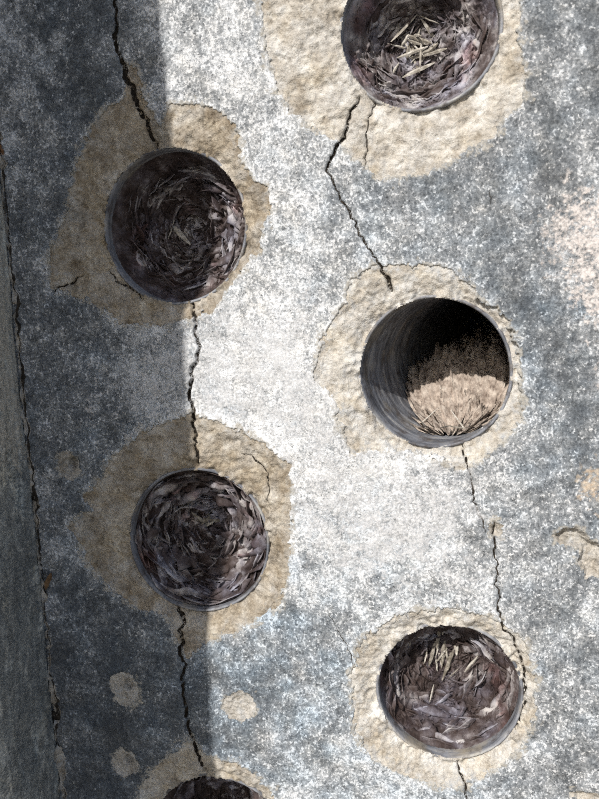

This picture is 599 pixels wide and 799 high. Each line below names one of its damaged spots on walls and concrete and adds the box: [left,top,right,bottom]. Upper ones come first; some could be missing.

crack [112,0,159,147]
crack [325,97,393,292]
crack [110,272,142,299]
crack [187,303,201,464]
crack [0,134,66,797]
crack [462,444,527,730]
spalling [552,525,599,579]
crack [177,607,204,767]
crack [457,762,468,799]